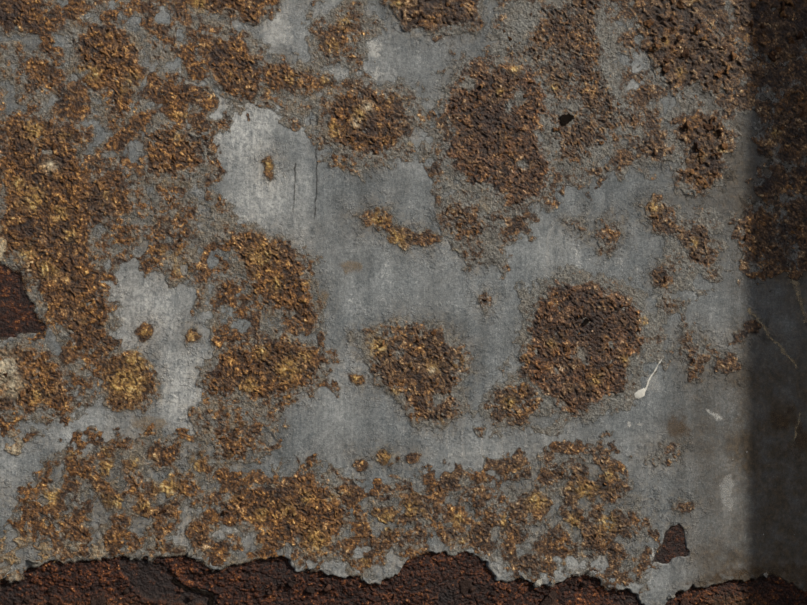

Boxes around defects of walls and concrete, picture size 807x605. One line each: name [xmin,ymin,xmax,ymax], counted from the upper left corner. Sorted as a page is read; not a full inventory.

corrosion [353,0,807,274]
peeling [0,261,47,340]
corrosion [0,0,649,568]
corrosion [648,266,673,288]
peeling [652,524,689,564]
peeling [0,548,642,605]
peeling [665,572,807,605]